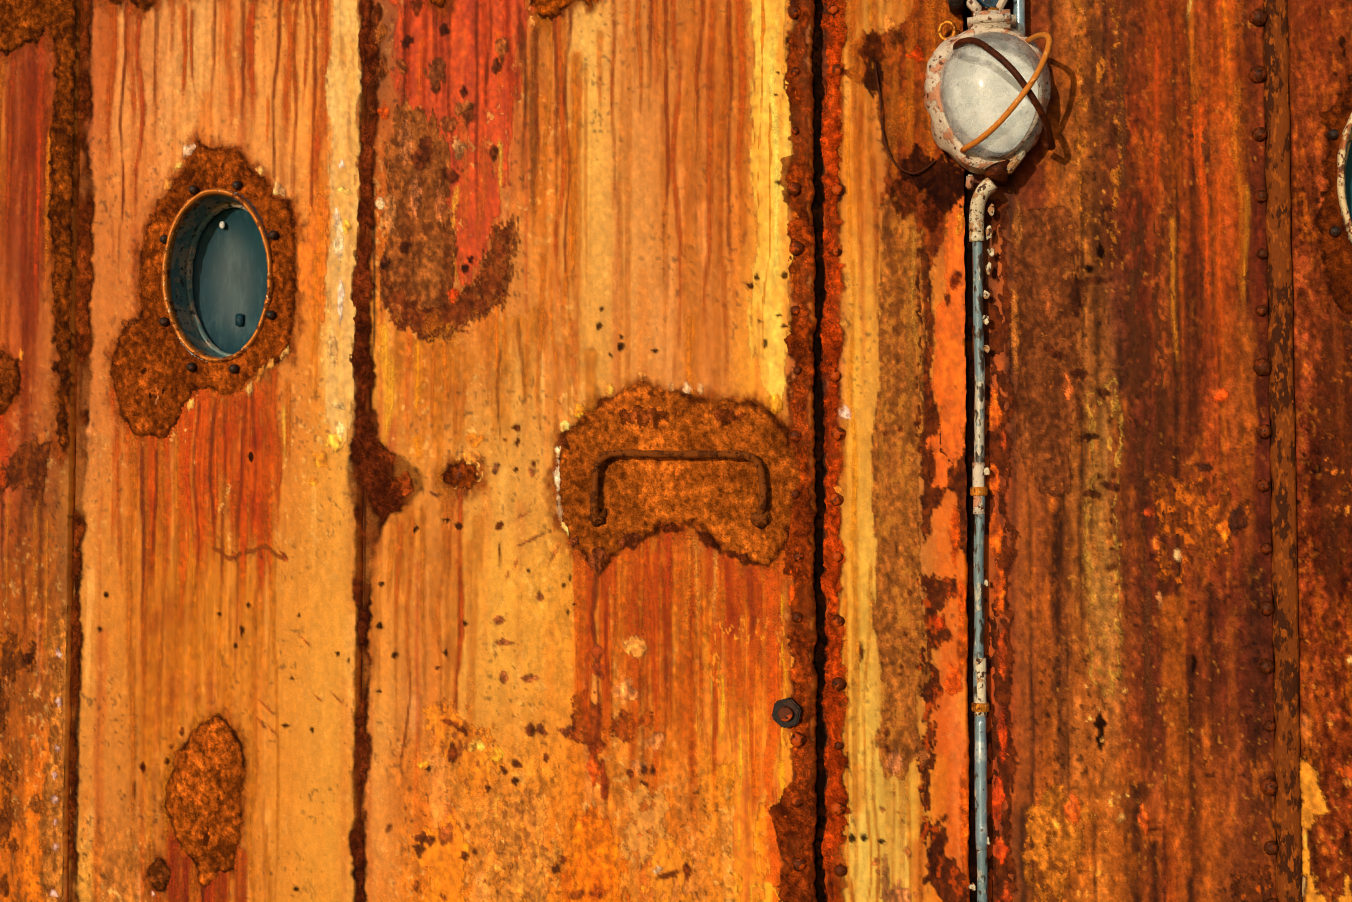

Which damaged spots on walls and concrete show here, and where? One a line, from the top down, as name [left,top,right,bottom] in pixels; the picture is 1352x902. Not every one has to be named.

rust [0,0,329,902]
rust [348,0,893,902]
peeling [843,0,970,902]
rust [893,767,924,902]
rust [904,0,959,163]
rust [972,198,1019,902]
rust [1110,0,1230,756]
rust [1232,86,1246,285]
rust [1230,860,1277,902]
rust [1314,72,1352,594]